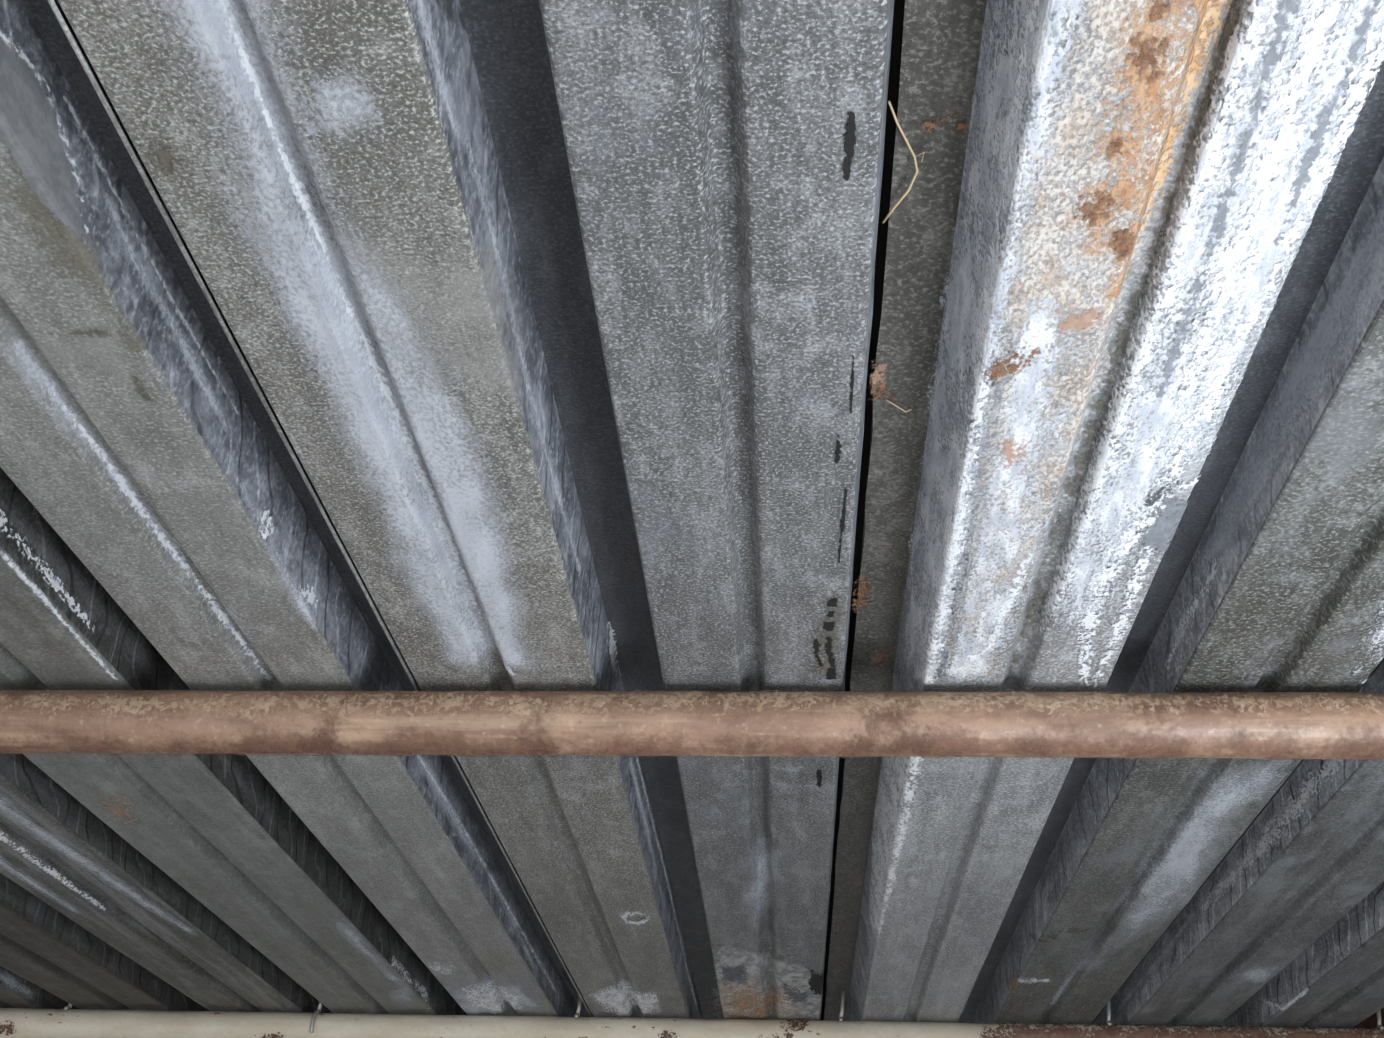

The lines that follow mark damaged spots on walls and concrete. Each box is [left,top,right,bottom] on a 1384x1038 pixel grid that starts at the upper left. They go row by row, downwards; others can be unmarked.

rust [950,0,1230,677]
leakage [897,0,1384,692]